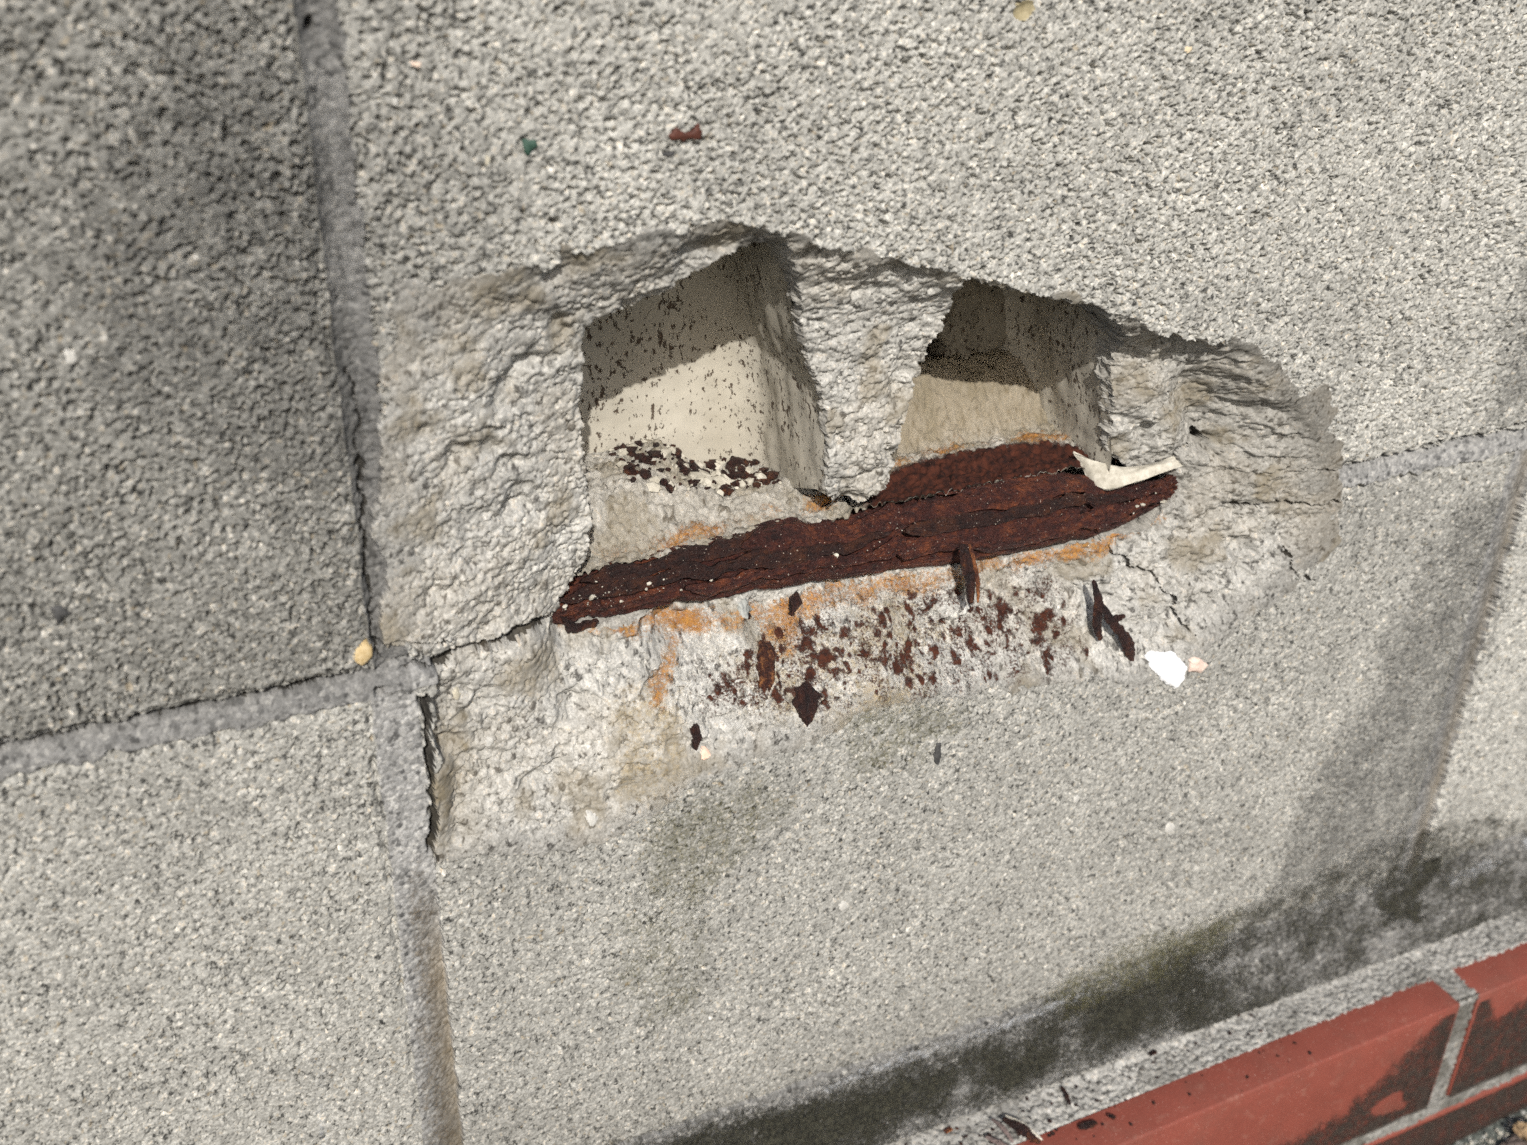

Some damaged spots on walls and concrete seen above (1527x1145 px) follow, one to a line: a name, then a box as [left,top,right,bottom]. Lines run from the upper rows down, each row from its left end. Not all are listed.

crack [4,357,555,863]
spalling [369,217,1345,864]
corrosion [552,431,1179,751]
leakage [638,808,1527,1145]